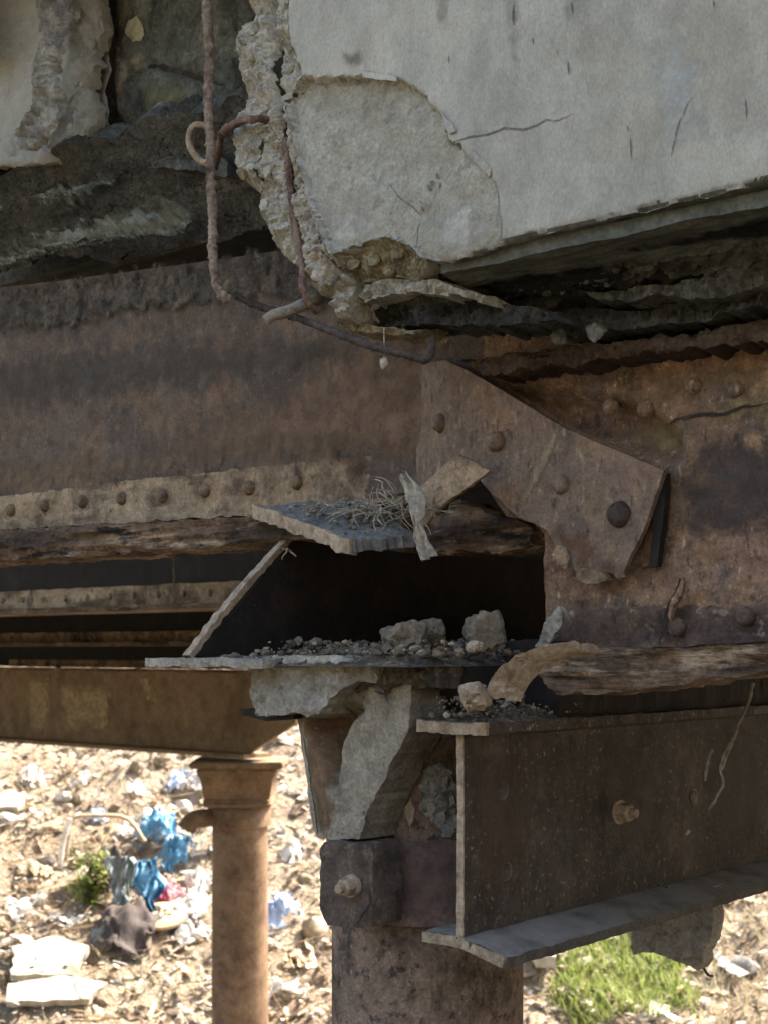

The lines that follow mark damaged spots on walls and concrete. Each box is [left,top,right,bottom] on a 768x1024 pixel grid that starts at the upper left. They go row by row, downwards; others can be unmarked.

spalling [14,0,97,151]
crack [446,114,572,147]
crack [671,97,693,158]
peeling [186,0,768,365]
corrosion [175,337,445,478]
crack [669,403,767,425]
spalling [356,655,475,695]
peeling [302,736,317,833]
peeling [403,763,457,837]